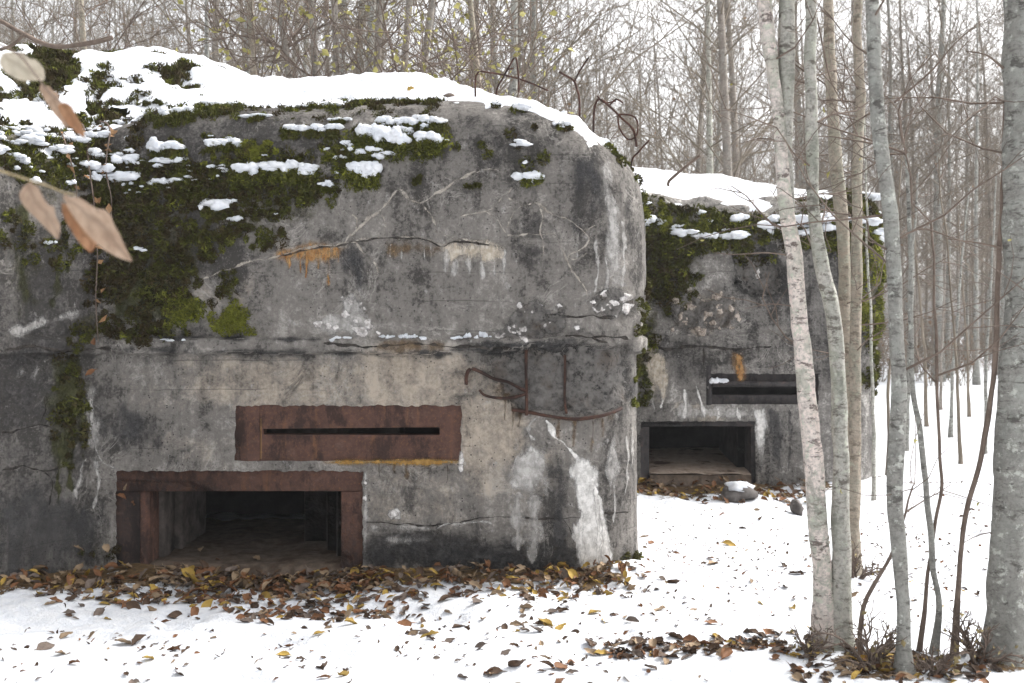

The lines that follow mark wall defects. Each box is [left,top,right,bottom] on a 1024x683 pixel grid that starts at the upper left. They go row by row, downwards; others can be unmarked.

corrosion [276,243,339,286]
efflorescence [444,241,506,280]
crack [203,168,772,365]
corrosion [733,354,745,381]
water stain [368,418,634,569]
crack [366,511,628,542]